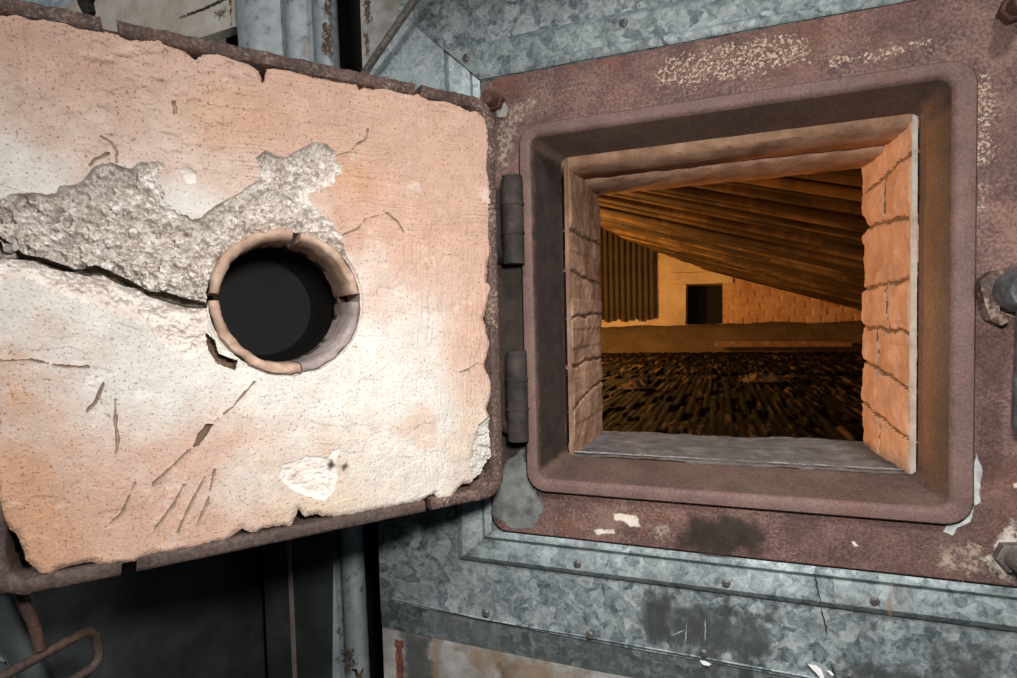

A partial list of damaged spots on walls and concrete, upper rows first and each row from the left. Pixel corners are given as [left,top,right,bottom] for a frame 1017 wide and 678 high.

rust [320,0,334,55]
rust [363,0,373,55]
crack [0,236,208,309]
spalling [0,142,346,370]
peeling [279,448,340,501]
rust [394,640,404,678]